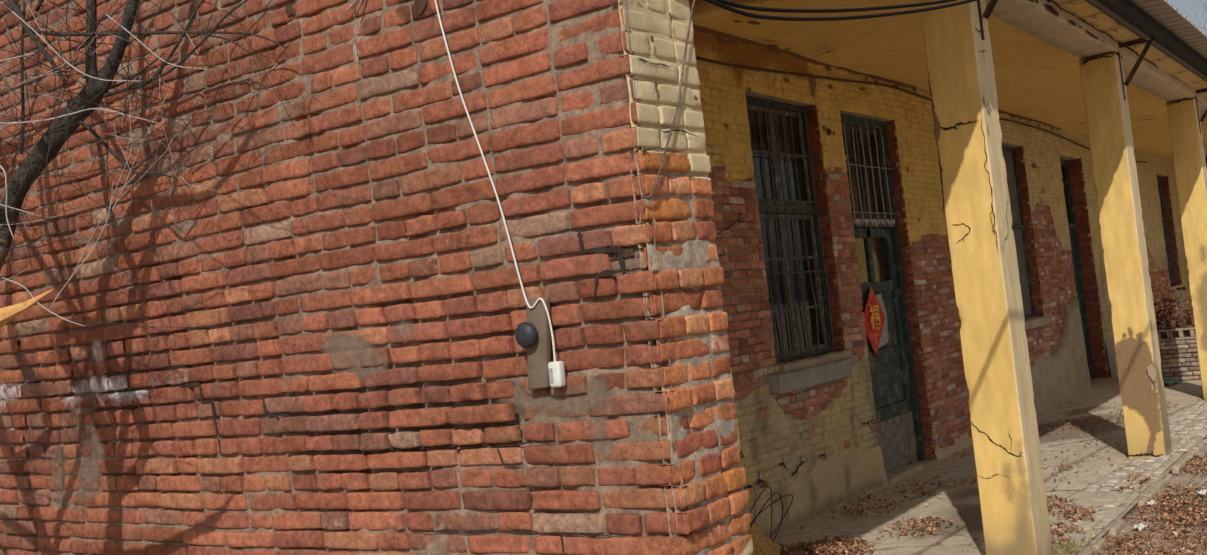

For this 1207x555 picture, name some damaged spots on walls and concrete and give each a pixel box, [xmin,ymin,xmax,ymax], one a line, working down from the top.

crack [927,68,1009,250]
peeling [1025,187,1077,366]
crack [843,422,1164,514]